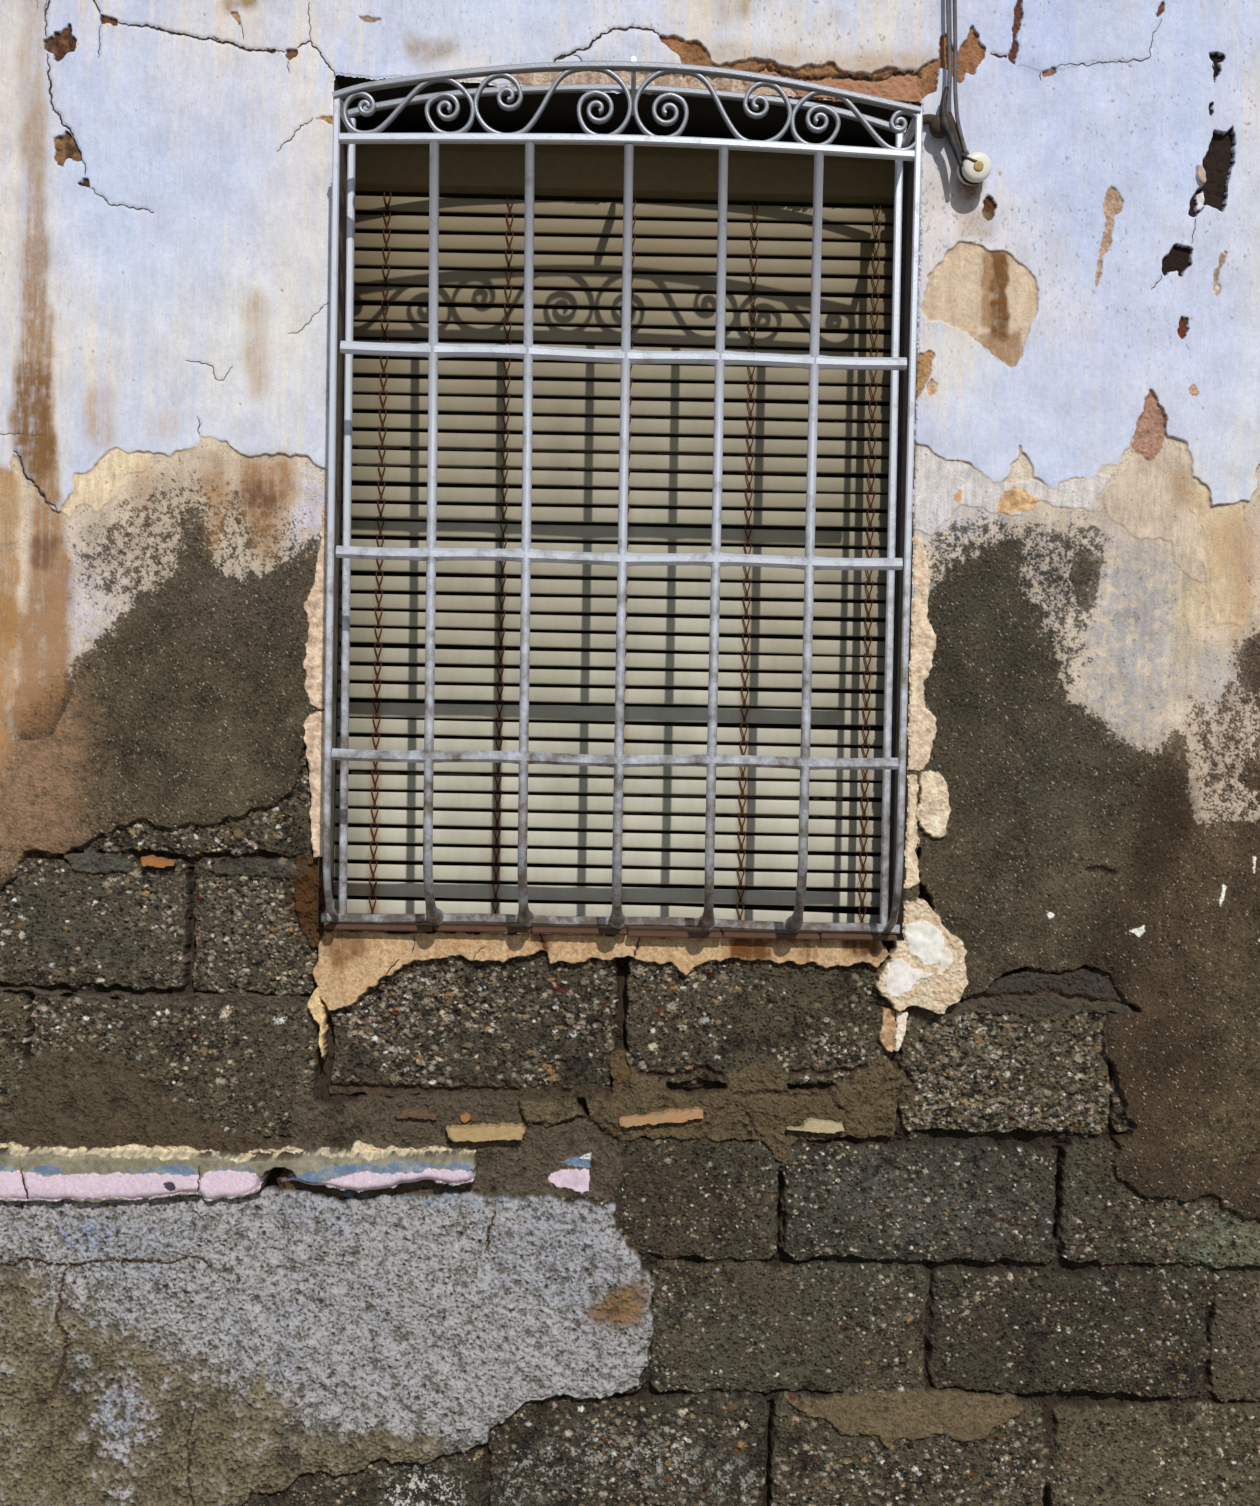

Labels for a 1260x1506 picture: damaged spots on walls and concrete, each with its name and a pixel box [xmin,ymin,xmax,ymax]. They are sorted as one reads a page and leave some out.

crack [36,0,153,213]
crack [93,0,335,74]
crack [554,26,662,62]
crack [990,19,1162,79]
flaking render [1188,102,1236,217]
flaking render [921,243,1040,367]
flaking render [1162,244,1194,277]
damp [0,237,81,848]
damp [243,461,294,555]
flaking render [0,436,328,785]
flaking render [913,389,1260,836]
peeling [0,1141,477,1202]